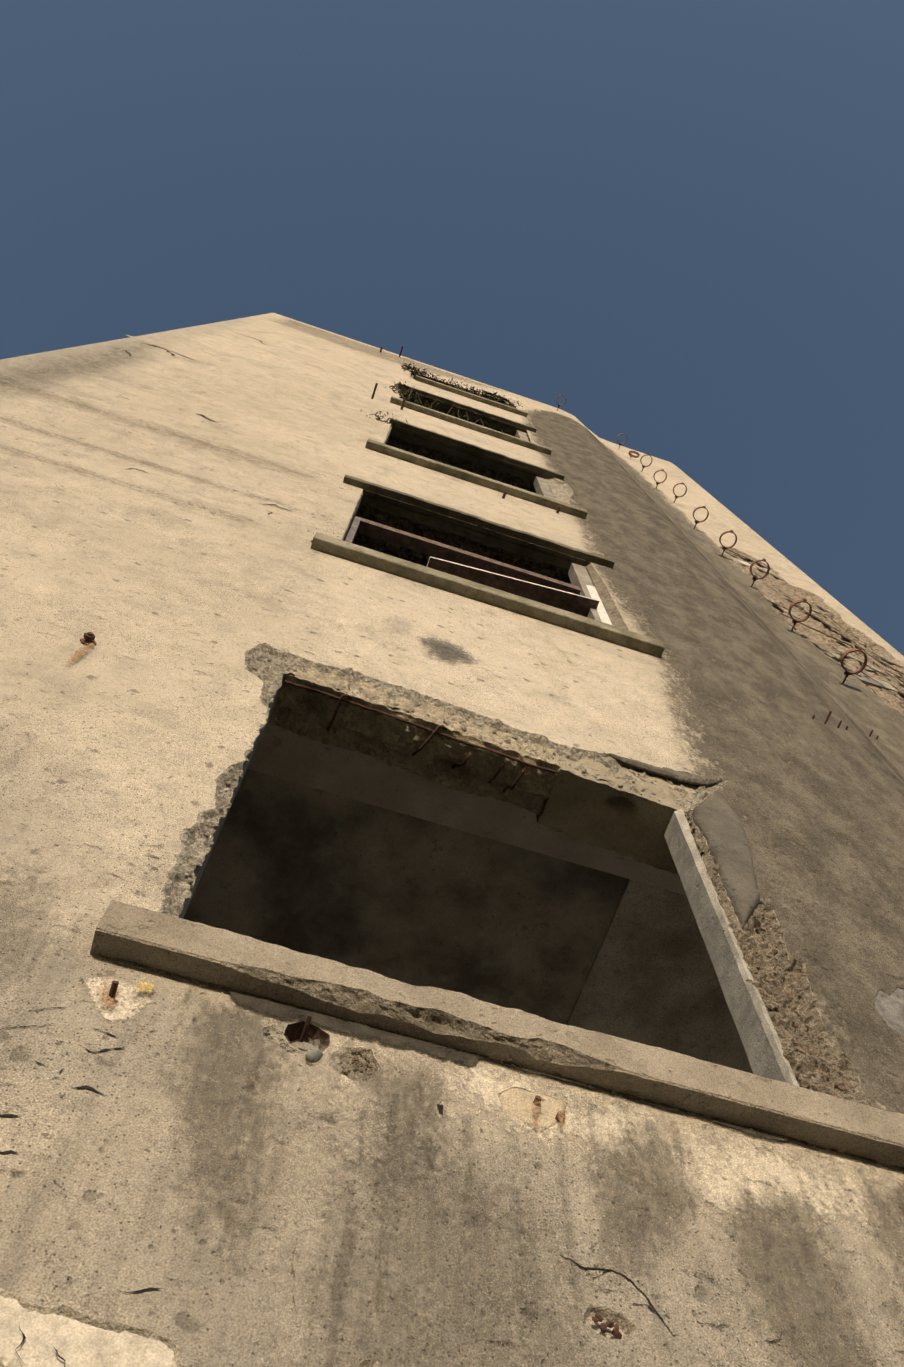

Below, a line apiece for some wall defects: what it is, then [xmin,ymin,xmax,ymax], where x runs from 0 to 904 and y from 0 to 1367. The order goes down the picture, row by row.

spalling [713,543,904,716]
spalling [158,643,869,1106]
peeling [874,987,904,1036]
water stain [185,1012,283,1230]
peeling [0,1288,181,1367]
crack [560,1250,679,1335]
water stain [366,1052,904,1367]